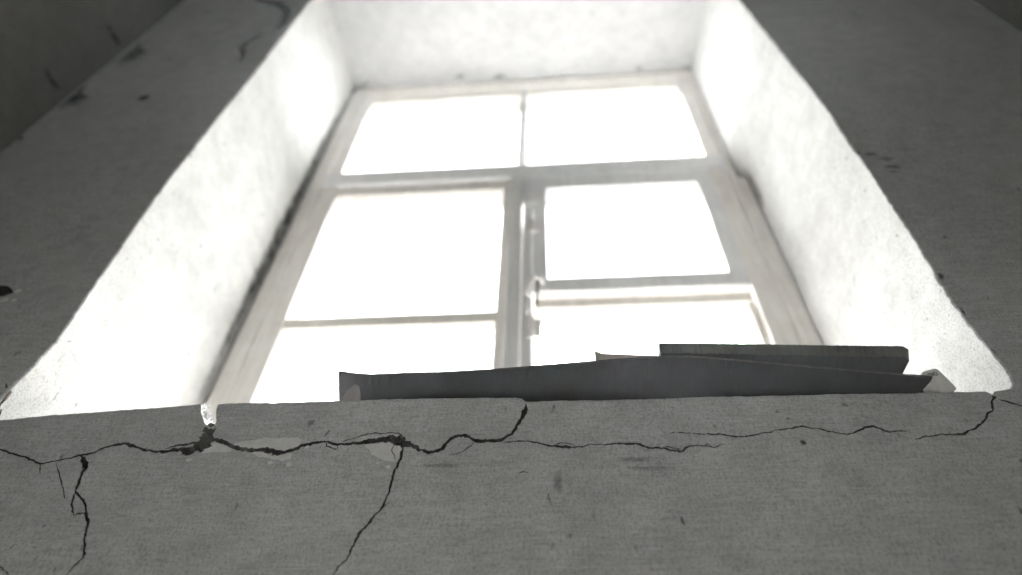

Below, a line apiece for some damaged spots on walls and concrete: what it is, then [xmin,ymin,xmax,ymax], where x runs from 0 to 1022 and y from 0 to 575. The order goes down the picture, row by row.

crack [0,383,12,415]
crack [0,393,1022,575]